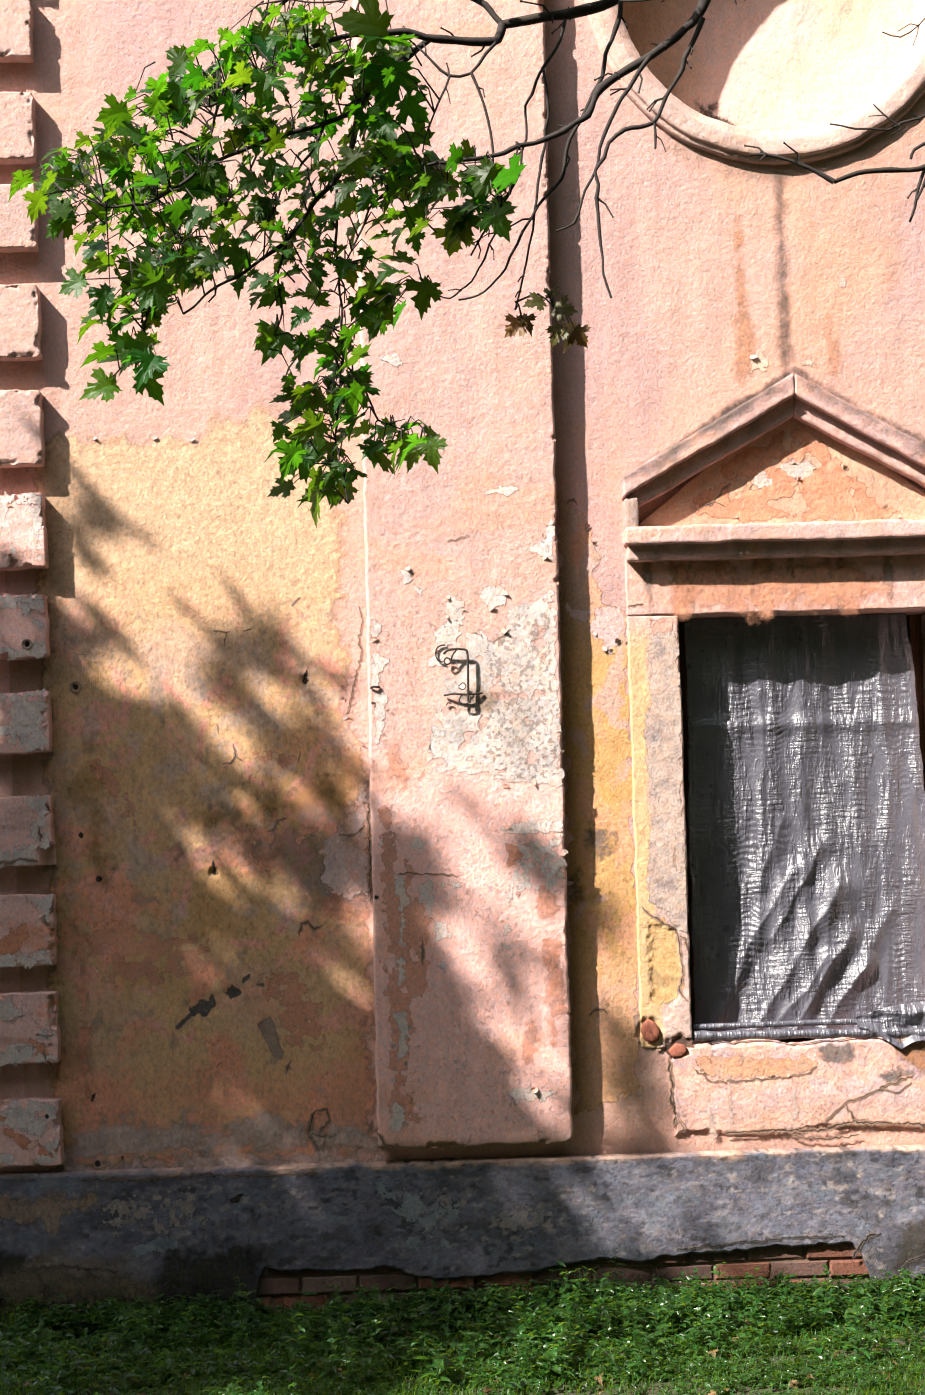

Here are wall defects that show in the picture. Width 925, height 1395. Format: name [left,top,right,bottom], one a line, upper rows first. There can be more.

peeling [692,424,901,524]
peeling [0,404,462,1169]
peeling [426,499,817,1115]
damp [49,1110,383,1172]
crack [667,1056,817,1133]
crack [723,1075,925,1141]
damp [0,1186,208,1239]